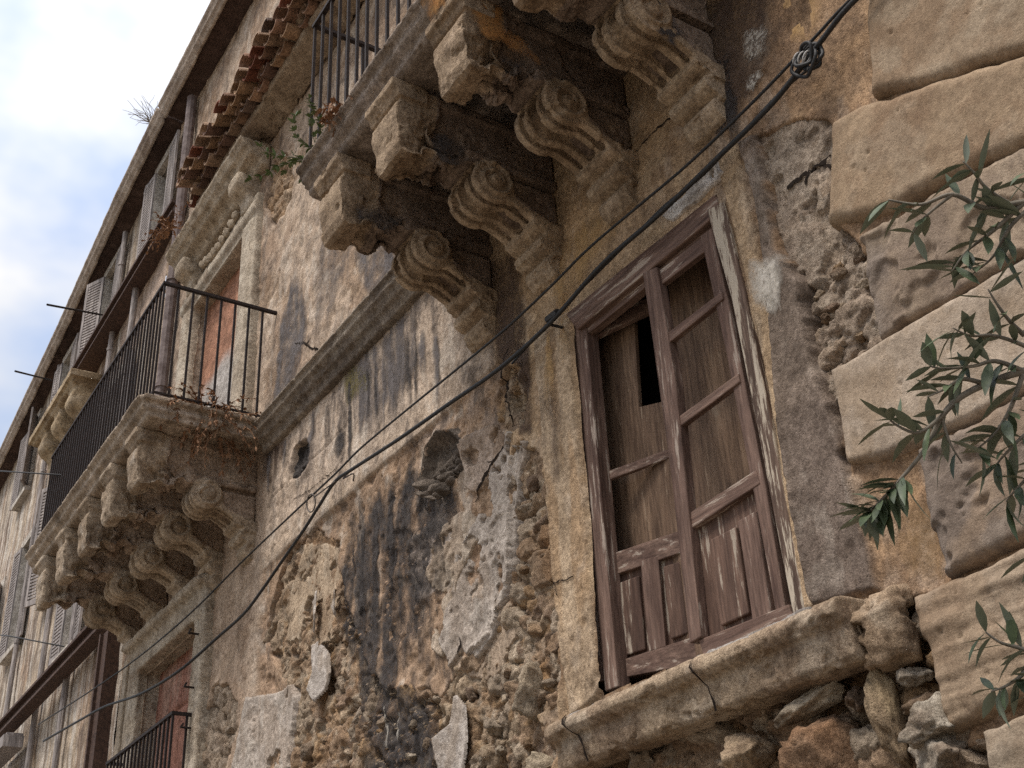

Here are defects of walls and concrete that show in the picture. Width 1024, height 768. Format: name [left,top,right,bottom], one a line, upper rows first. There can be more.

leakage [307,318,439,456]
crack [475,348,514,502]
spalling [760,119,882,403]
spalling [202,367,561,768]
leakage [342,460,457,768]
crack [689,657,717,711]